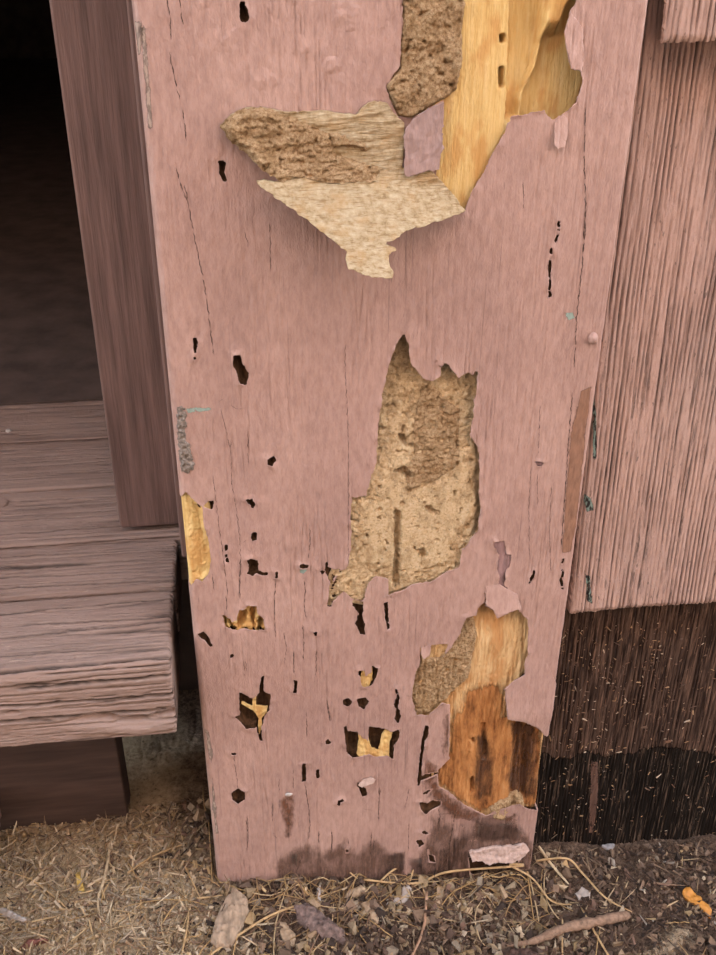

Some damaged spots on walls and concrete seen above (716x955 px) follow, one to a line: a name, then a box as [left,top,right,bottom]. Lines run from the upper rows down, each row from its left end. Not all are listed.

spalling [386,0,584,209]
peeling [181,492,211,584]
peeling [222,606,265,630]
spalling [327,335,481,605]
spalling [412,541,556,820]
peeling [469,843,529,871]